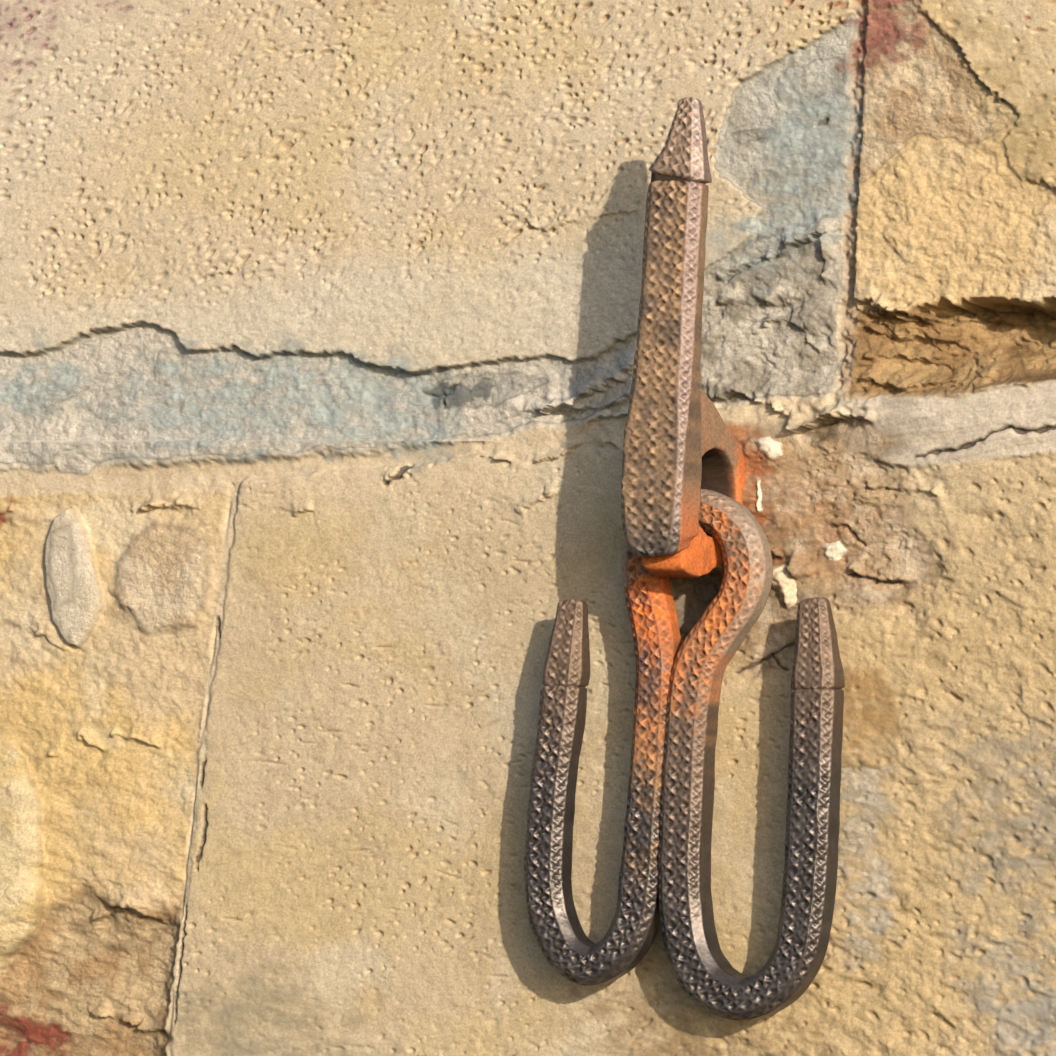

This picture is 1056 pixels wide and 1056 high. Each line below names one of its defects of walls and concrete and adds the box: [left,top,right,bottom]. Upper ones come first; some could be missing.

spalling [700,0,1019,402]
spalling [0,322,637,474]
corrosion [727,425,766,530]
spalling [853,306,1056,393]
crack [916,425,1056,458]